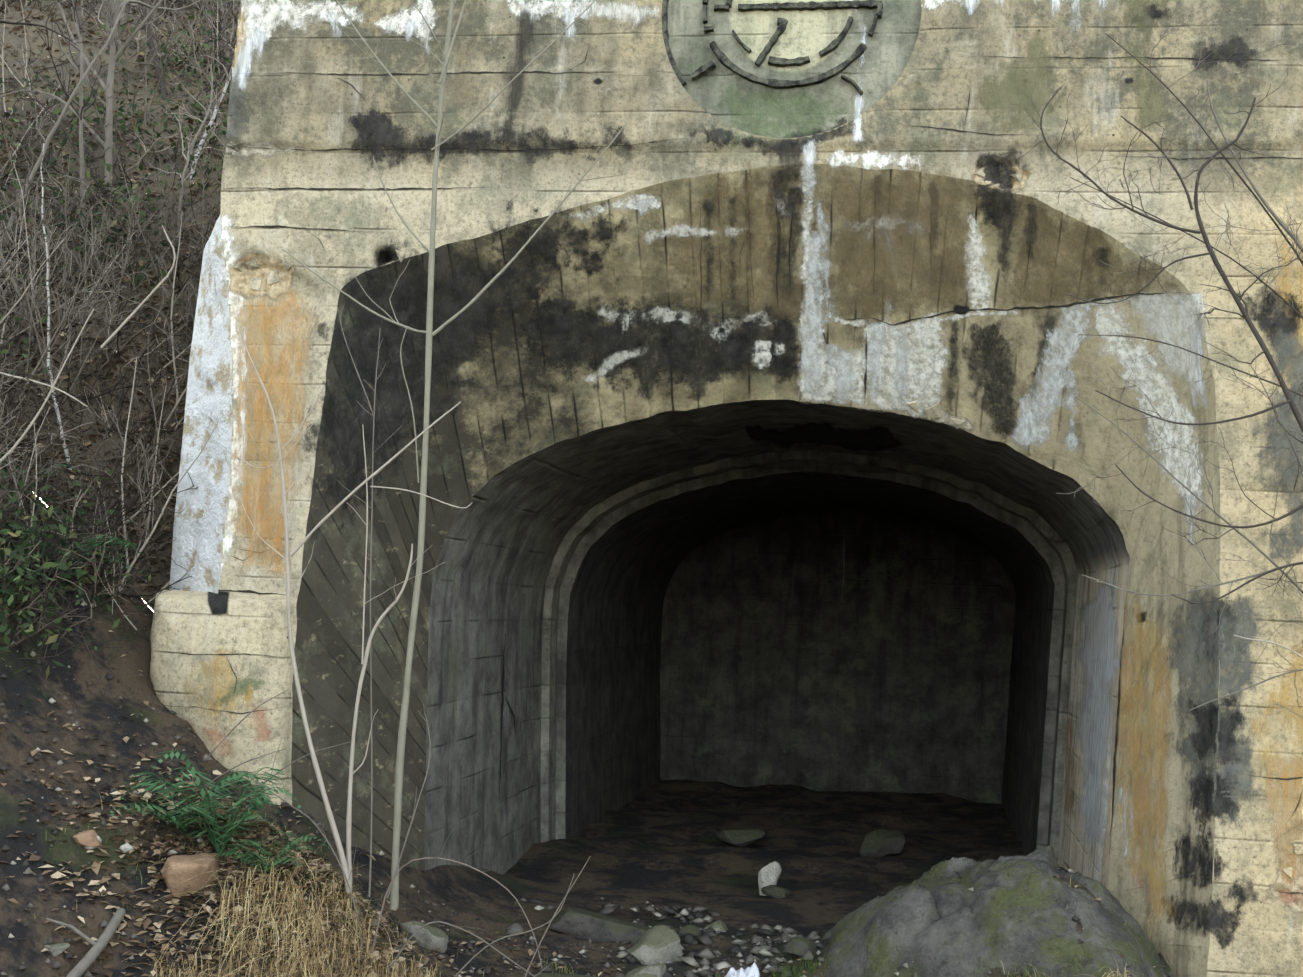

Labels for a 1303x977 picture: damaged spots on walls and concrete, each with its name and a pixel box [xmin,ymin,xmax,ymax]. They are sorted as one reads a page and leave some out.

damp [226,0,435,141]
damp [349,0,656,168]
damp [924,0,947,9]
damp [1193,36,1256,69]
damp [586,88,1205,542]
crack [739,169,1198,404]
corrosion [232,289,311,575]
spalling [746,423,901,452]
spalling [208,581,230,614]
damp [1161,589,1262,949]